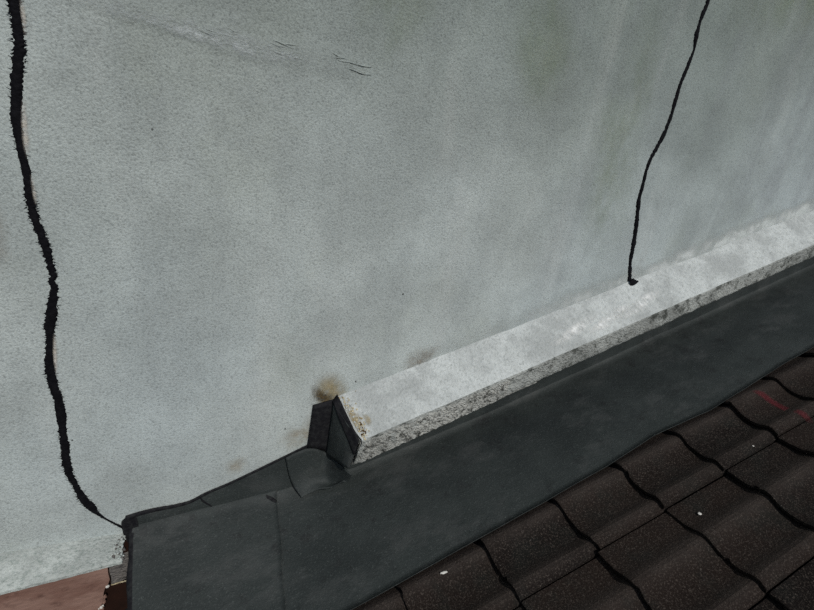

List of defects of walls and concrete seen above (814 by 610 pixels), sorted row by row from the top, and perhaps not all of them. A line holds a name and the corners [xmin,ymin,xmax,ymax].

crack [6,0,122,528]
corrosion [317,381,339,402]
crack [627,0,710,286]